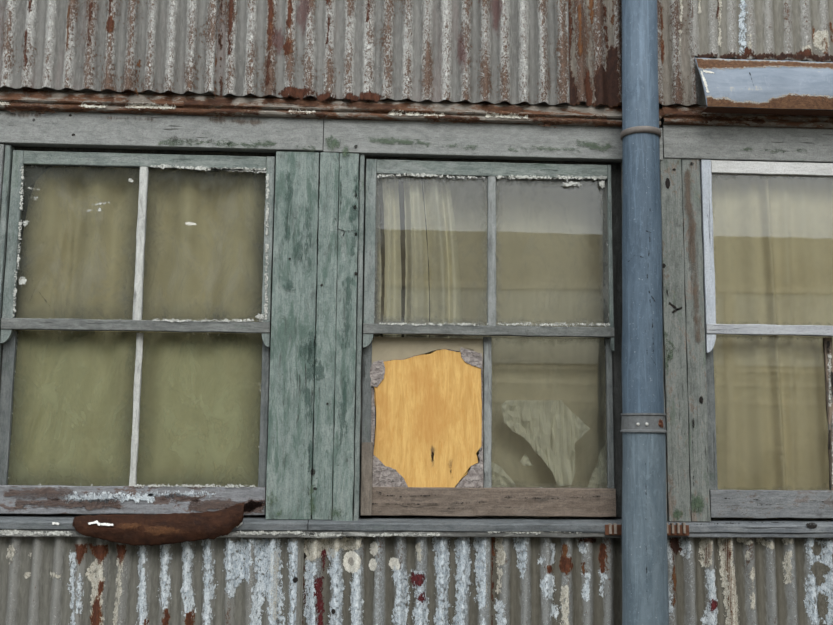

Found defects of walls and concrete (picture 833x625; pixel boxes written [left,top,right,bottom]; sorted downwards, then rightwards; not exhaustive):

corrosion [183,0,400,119]
corrosion [424,0,622,128]
corrosion [695,0,833,71]
peeling [65,484,257,504]
corrosion [73,499,266,565]
peeling [50,550,124,625]
corrosion [90,580,105,625]
peeling [136,545,149,625]
corrosion [303,548,328,625]
peeling [158,523,557,625]
peeling [538,543,570,625]
peeling [803,538,833,625]